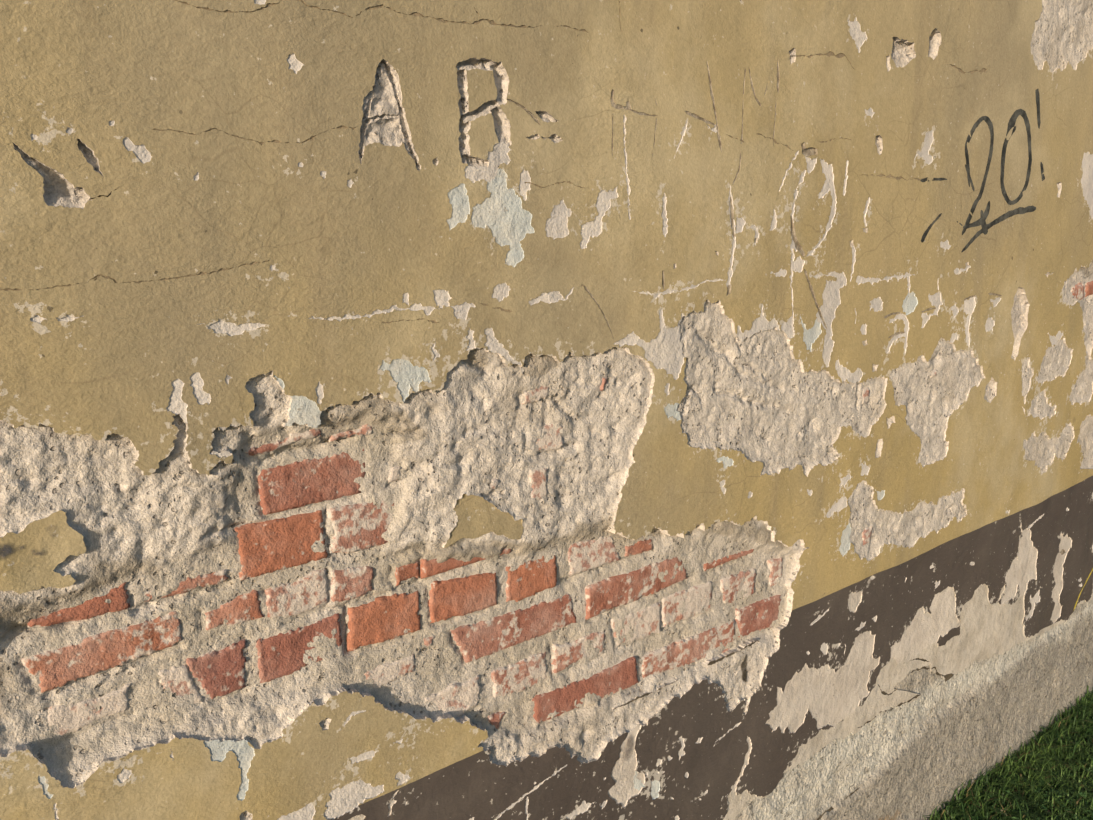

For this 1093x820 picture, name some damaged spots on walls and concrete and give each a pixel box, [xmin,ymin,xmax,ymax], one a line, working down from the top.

crack [174,0,587,32]
spalling [1031,0,1093,73]
spalling [12,134,92,209]
spalling [66,127,104,177]
crack [152,125,356,146]
peeling [446,165,618,267]
peeling [1081,152,1093,219]
crack [0,260,270,291]
spalling [1011,261,1093,474]
spalling [0,271,997,820]
peeling [1000,514,1072,623]